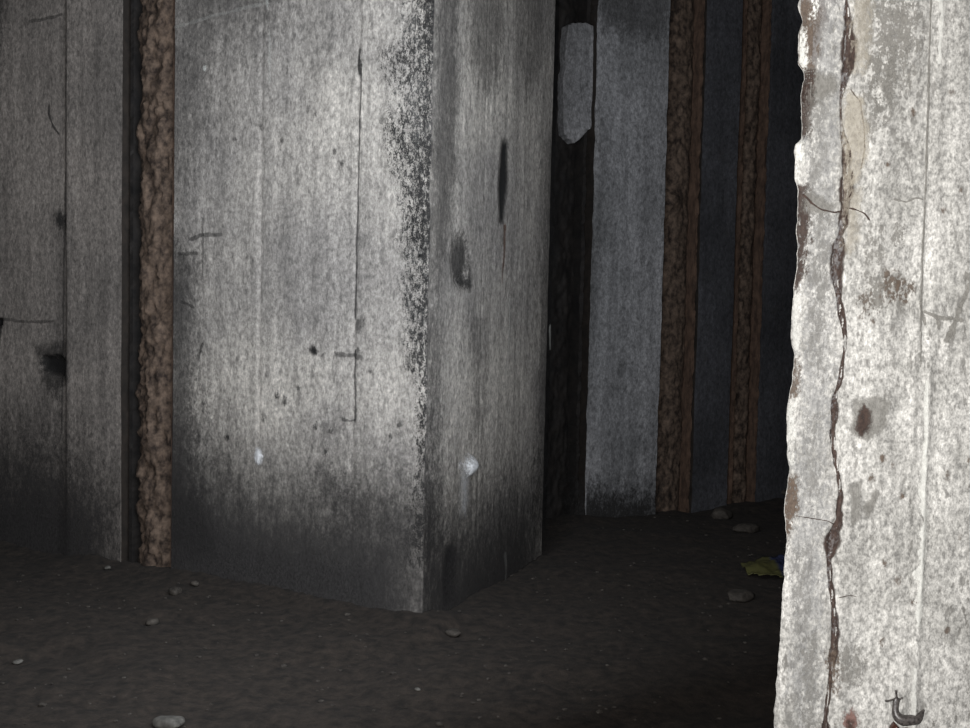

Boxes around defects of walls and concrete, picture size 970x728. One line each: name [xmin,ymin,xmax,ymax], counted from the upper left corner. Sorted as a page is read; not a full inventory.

spalling [794,0,837,294]
spalling [785,474,799,549]
spalling [789,356,801,400]
crack [798,0,870,728]